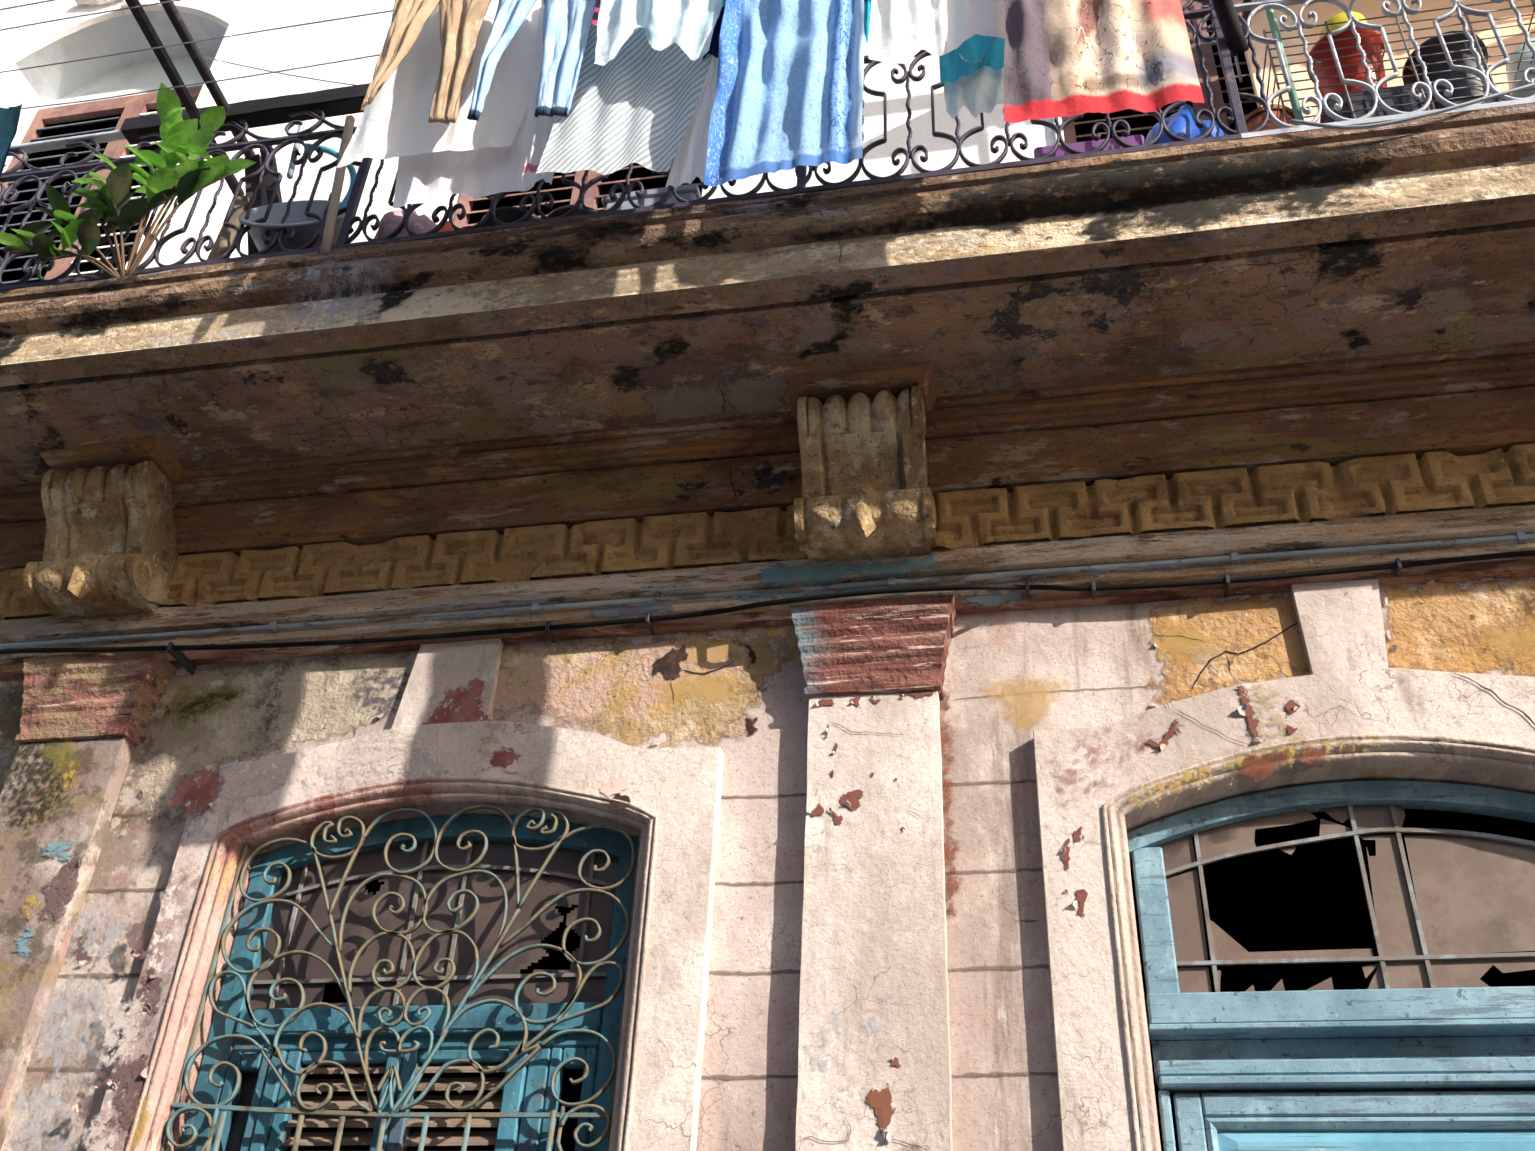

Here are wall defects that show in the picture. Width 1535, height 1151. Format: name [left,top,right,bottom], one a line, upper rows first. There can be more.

leakage [811,144,1390,244]
leakage [0,323,28,358]
flaking render [1384,577,1535,677]
leakage [165,685,238,725]
flaking render [129,601,793,823]
crack [1158,622,1298,746]
flaking render [1121,592,1359,804]
crack [1454,673,1535,725]
peeling [808,773,874,834]
peeling [1061,826,1085,870]
peeling [1064,889,1088,916]
peeling [863,1084,920,1151]